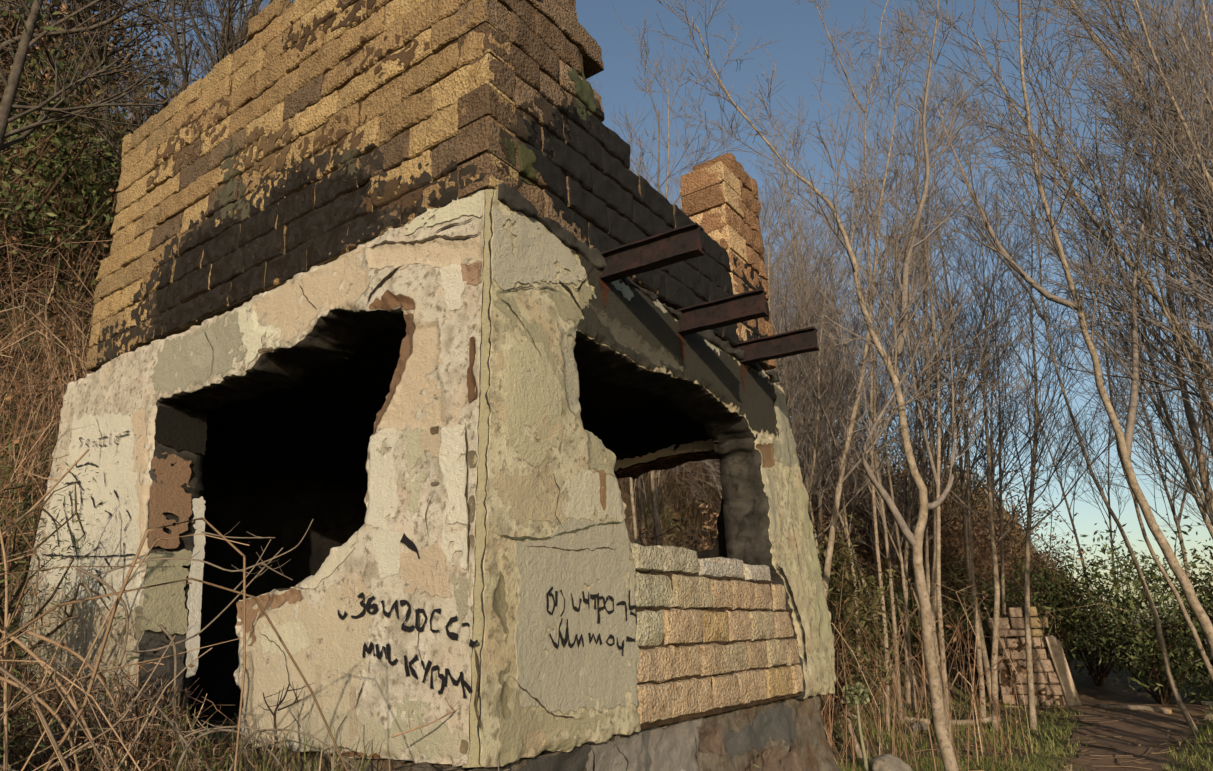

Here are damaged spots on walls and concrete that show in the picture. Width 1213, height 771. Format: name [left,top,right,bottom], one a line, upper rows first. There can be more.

spalling [281,0,430,78]
spalling [146,92,231,187]
damp [228,120,305,178]
spalling [298,115,367,160]
damp [360,177,423,213]
damp [152,307,281,395]
peeling [45,409,206,677]